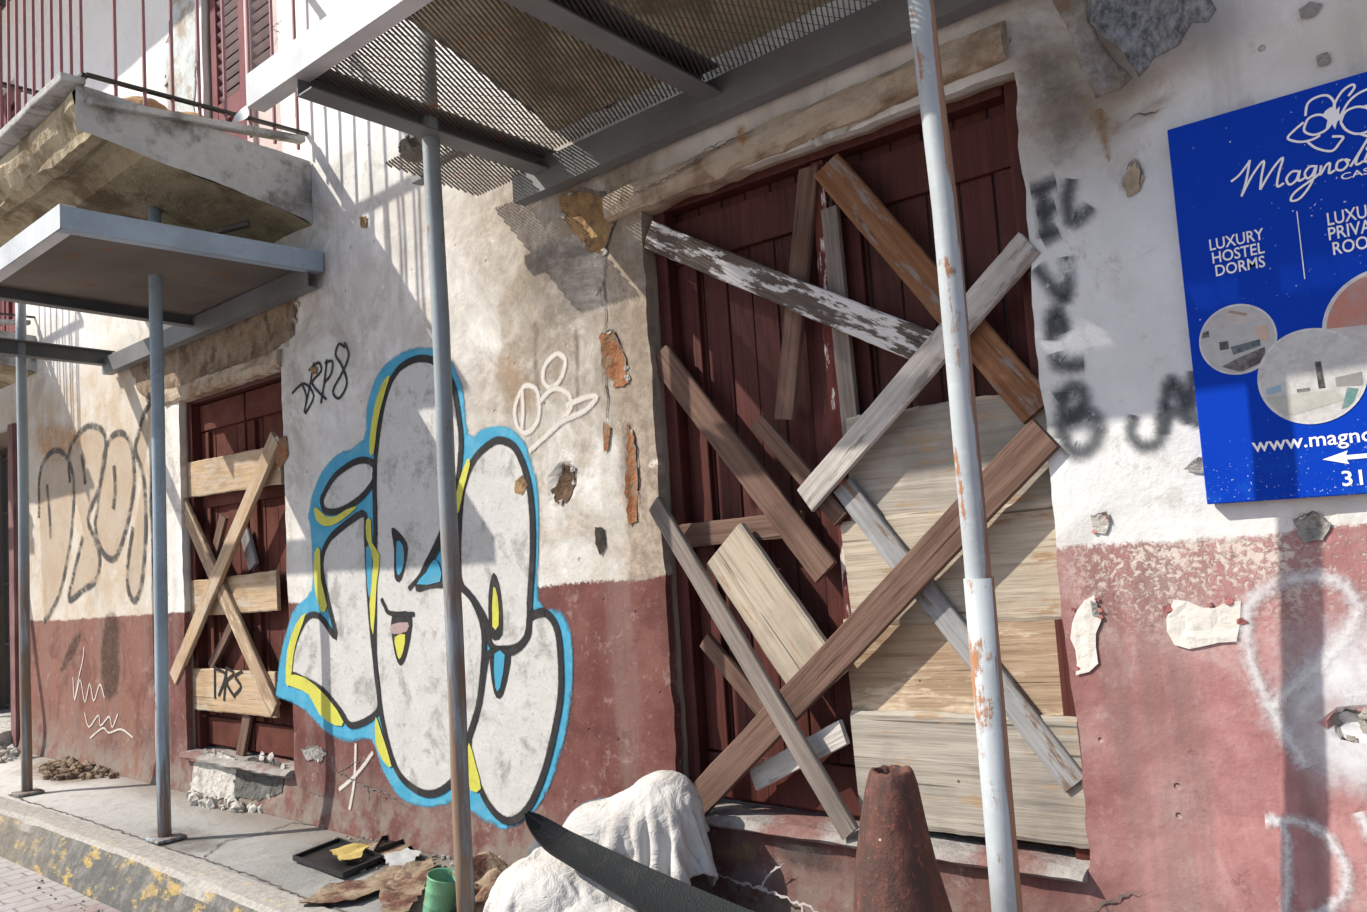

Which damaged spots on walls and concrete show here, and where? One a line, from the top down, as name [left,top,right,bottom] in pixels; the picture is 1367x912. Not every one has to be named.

spalling [559,187,615,256]
spalling [599,329,631,388]
spalling [551,463,576,505]
spalling [1293,511,1331,543]